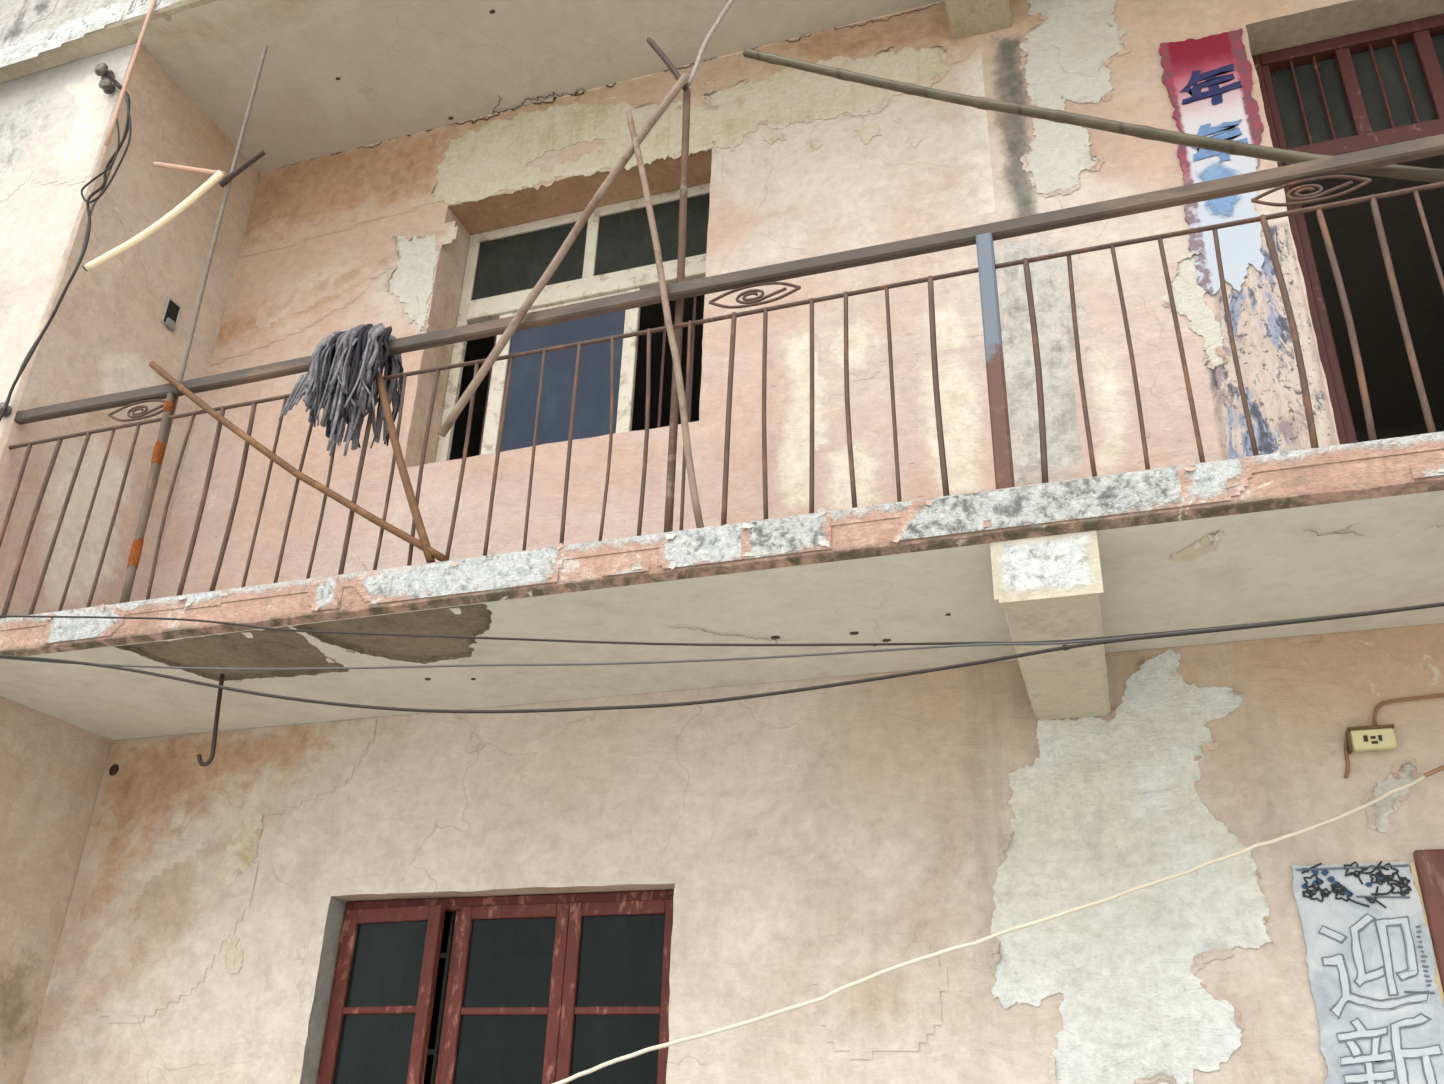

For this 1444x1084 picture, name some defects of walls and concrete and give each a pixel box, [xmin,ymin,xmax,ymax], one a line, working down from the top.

water stain [0,0,58,49]
peeling [429,33,995,231]
water stain [770,1,1069,227]
peeling [1019,0,1130,198]
peeling [385,234,442,334]
water stain [944,244,982,312]
water stain [993,224,1128,487]
peeling [0,293,1444,682]
peeling [218,814,264,886]
peeling [990,649,1277,1084]
peeling [1361,758,1423,833]